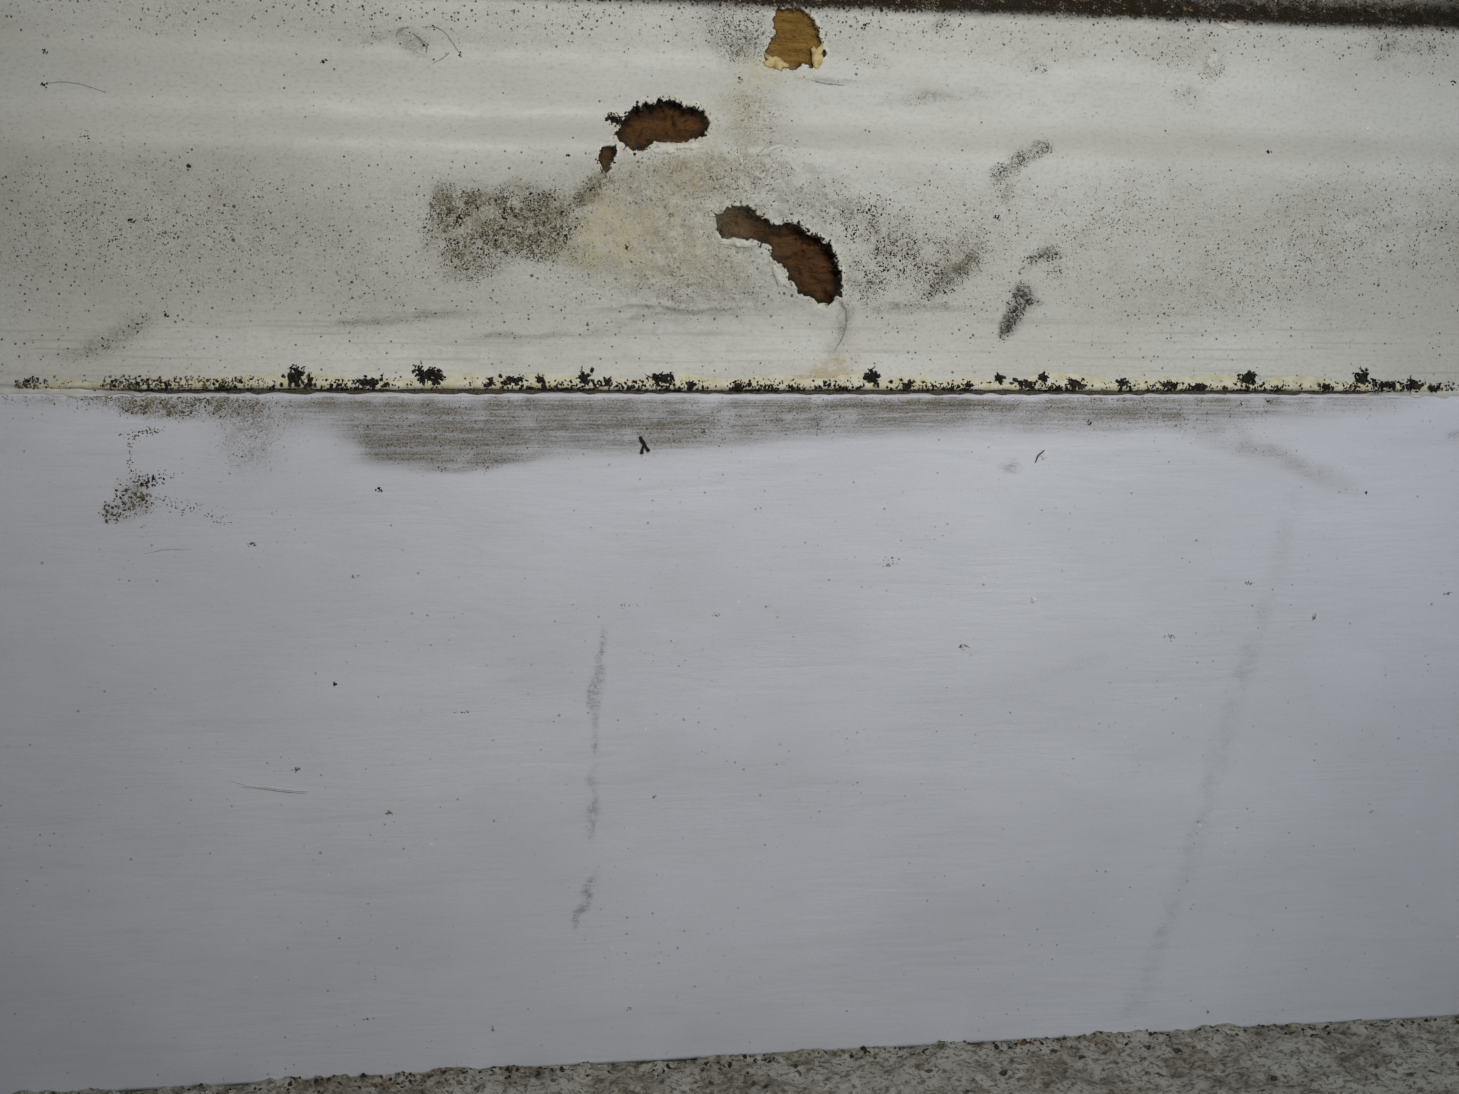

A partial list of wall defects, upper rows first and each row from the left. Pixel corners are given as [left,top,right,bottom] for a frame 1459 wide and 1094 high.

peeling [761,5,830,73]
spalling [598,98,710,173]
damp [0,2,1458,367]
spalling [715,205,842,305]
damp [2,395,1367,526]